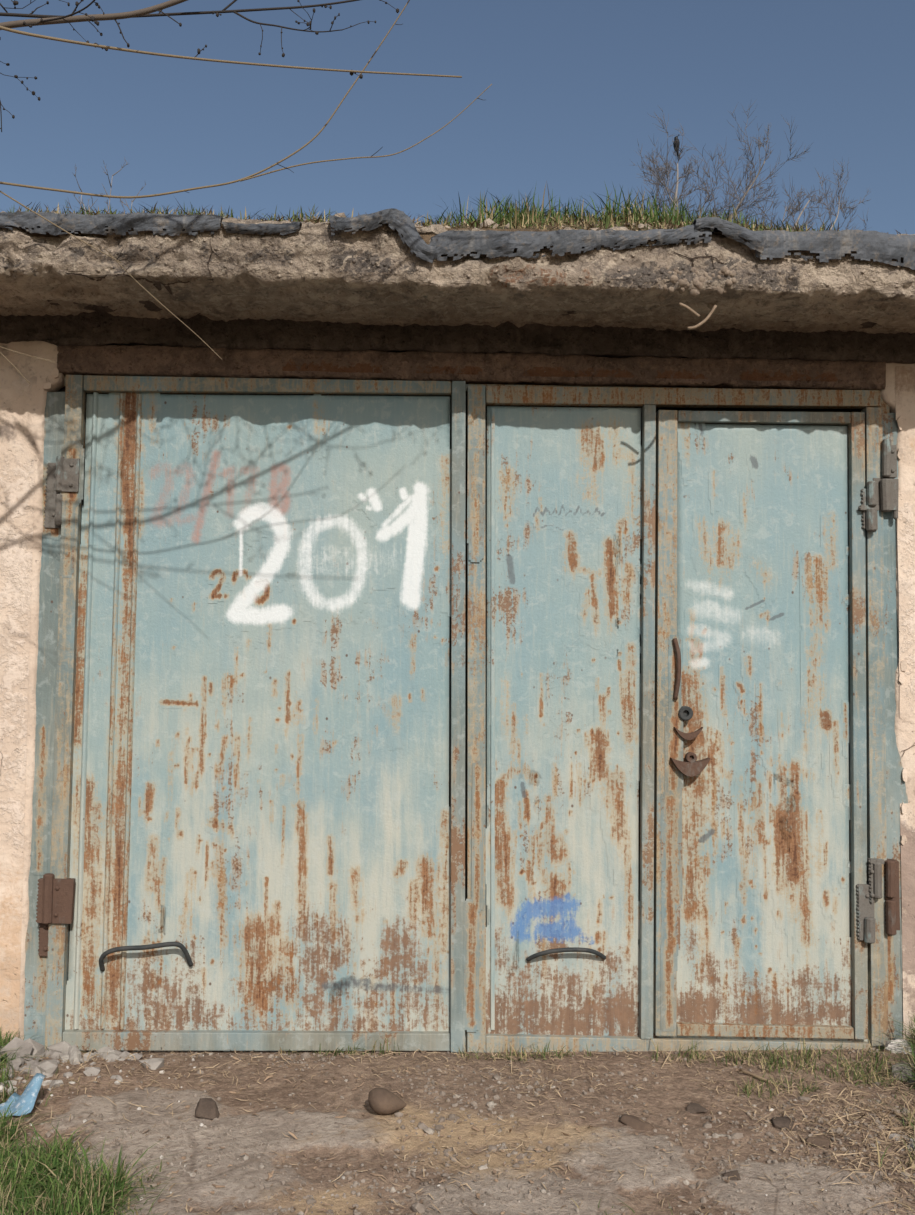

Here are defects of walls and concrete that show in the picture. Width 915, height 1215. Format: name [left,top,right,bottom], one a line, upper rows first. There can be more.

rust [31,392,874,1050]
rust [887,918,903,1004]
water stain [900,803,915,1042]